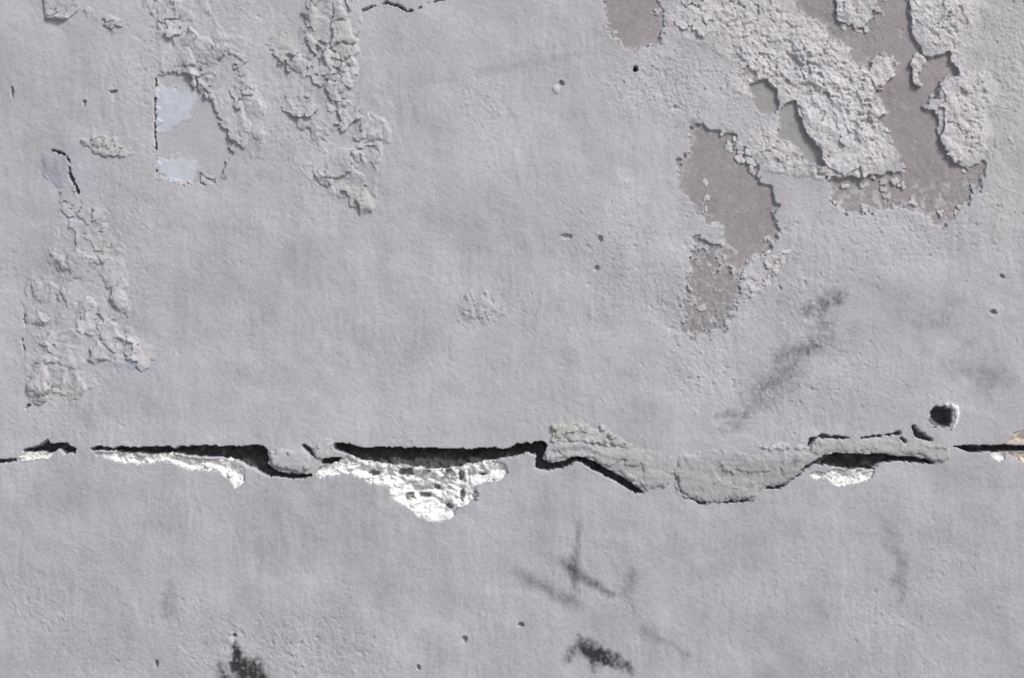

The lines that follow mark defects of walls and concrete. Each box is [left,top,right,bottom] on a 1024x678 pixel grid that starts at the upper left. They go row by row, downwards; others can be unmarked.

peeling [141,0,268,186]
peeling [266,0,393,217]
peeling [602,0,1003,341]
peeling [18,150,156,406]
spalling [96,450,245,489]
crack [0,441,642,492]
spalling [317,455,507,521]
crack [675,425,930,504]
spalling [811,468,873,486]
crack [955,443,1024,451]